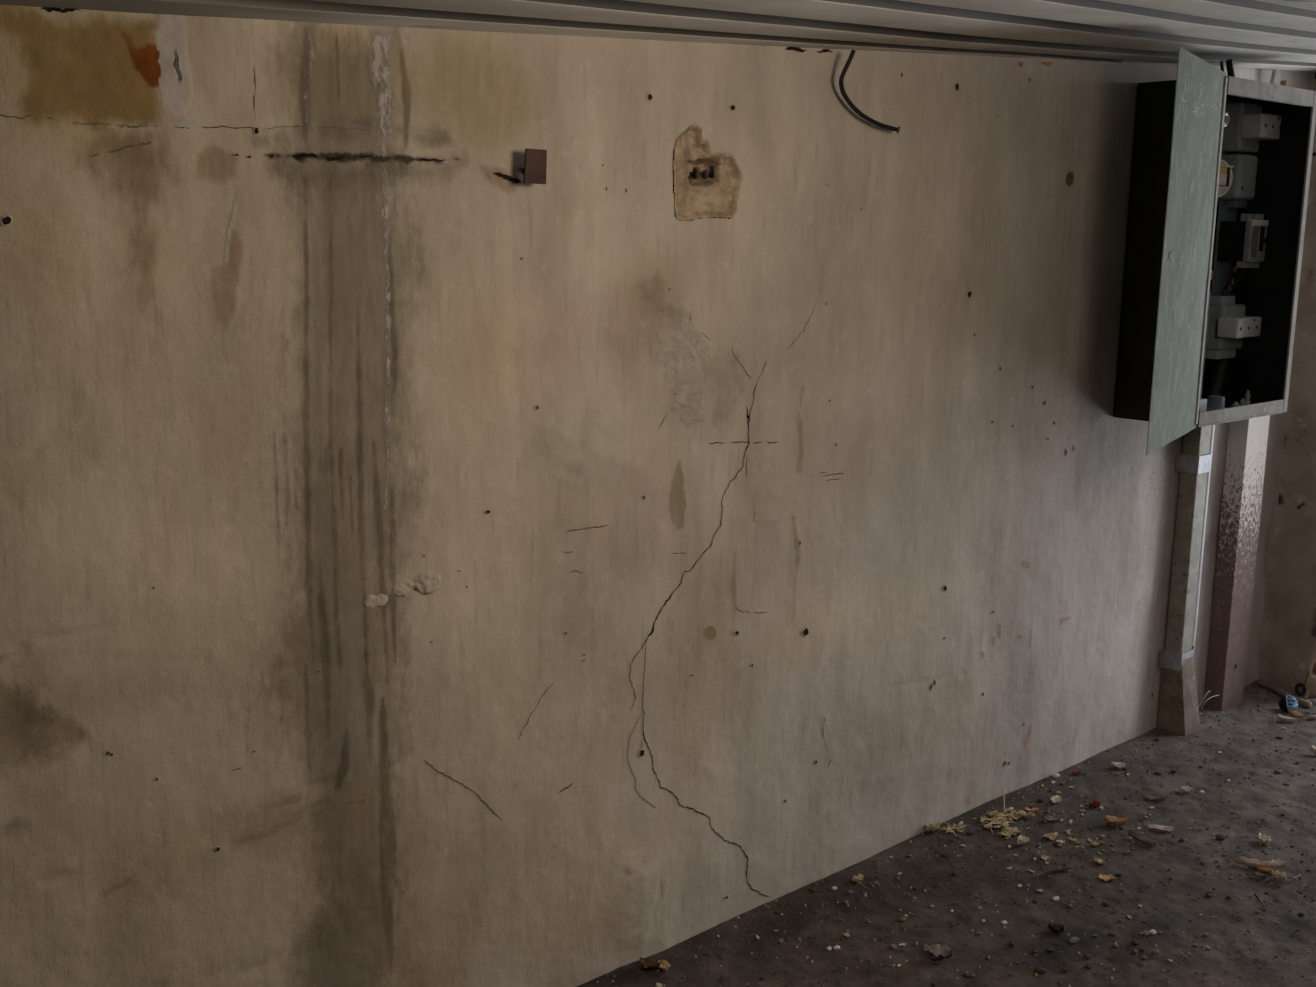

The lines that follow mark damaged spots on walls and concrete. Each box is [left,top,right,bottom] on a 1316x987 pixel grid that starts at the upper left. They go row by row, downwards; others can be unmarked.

leakage [0,5,174,151]
rust [130,44,161,87]
spalling [673,125,743,221]
leakage [187,18,455,987]
crack [628,304,816,897]